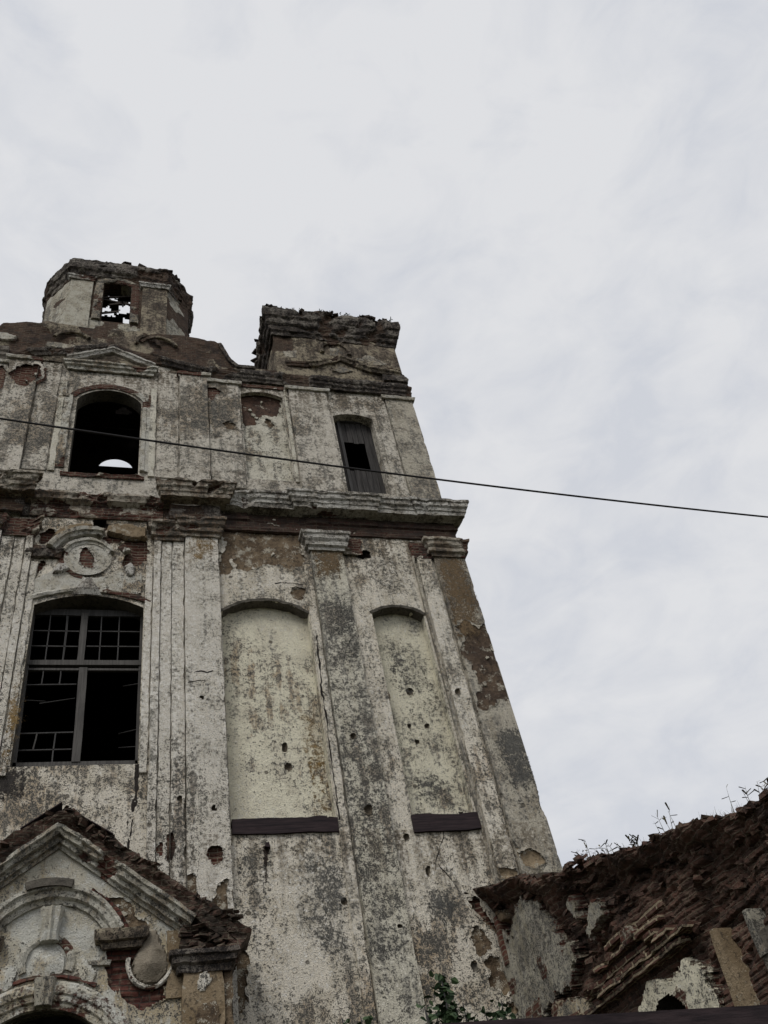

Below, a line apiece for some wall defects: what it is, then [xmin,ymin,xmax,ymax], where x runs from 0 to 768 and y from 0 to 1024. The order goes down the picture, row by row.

flaking render [0,363,47,390]
flaking render [220,395,284,430]
flaking render [35,527,58,545]
flaking render [78,546,98,570]
flaking render [93,520,151,568]
flaking render [453,613,510,713]
crack [316,635,340,820]
water stain [494,722,539,797]
flaking render [497,846,548,881]
flaking render [100,949,170,1013]
flaking render [459,889,641,1018]
flaking render [638,955,727,1012]